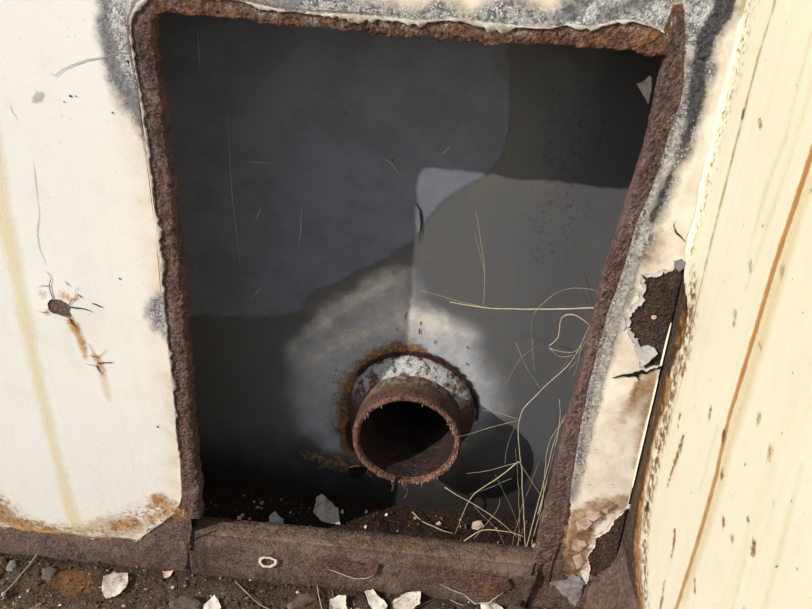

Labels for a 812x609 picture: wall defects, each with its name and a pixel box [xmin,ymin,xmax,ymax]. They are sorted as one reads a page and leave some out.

corrosion [250,0,392,16]
corrosion [127,0,162,300]
leakage [650,174,672,222]
leakage [681,57,706,147]
leakage [0,186,80,530]
peeling [38,273,92,356]
corrosion [301,338,480,484]
peeling [619,259,686,369]
corrosion [628,276,701,609]
corrosion [675,145,812,609]
peeling [549,495,628,606]